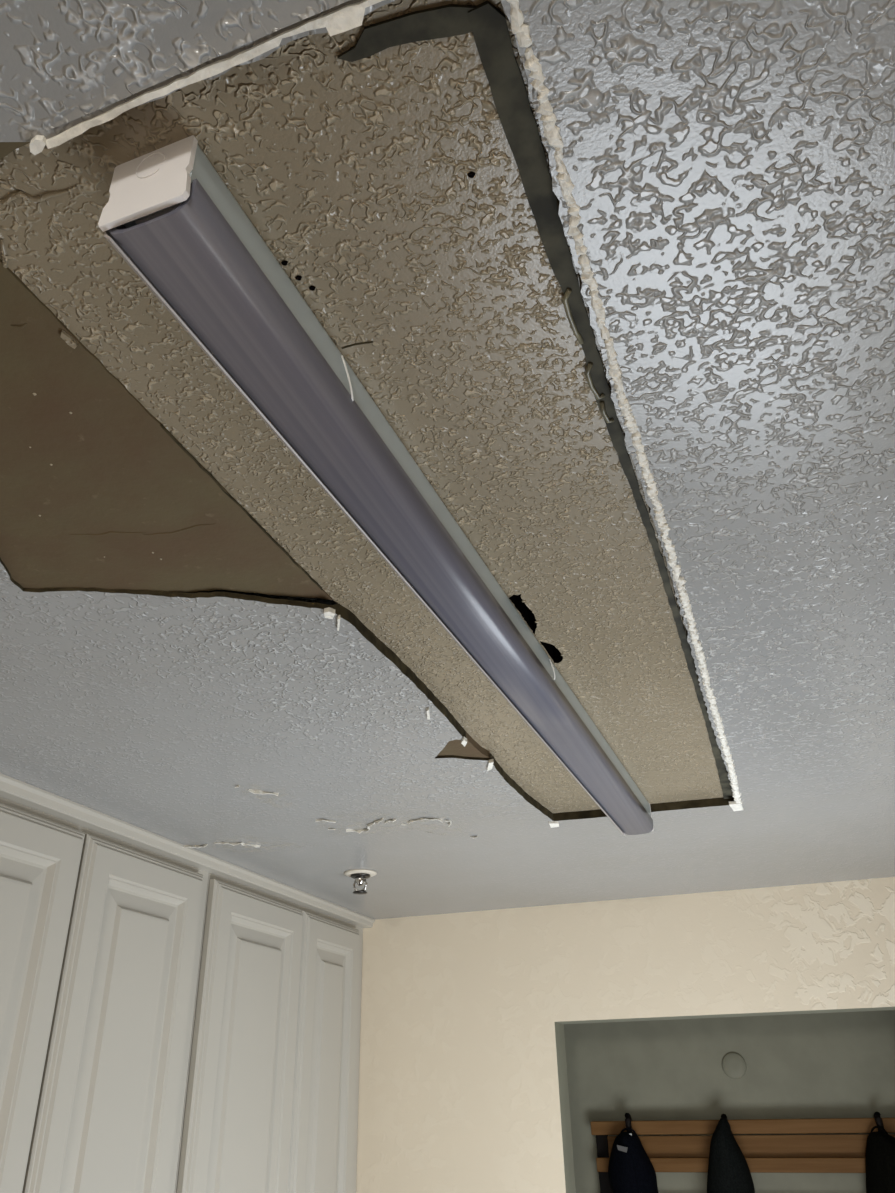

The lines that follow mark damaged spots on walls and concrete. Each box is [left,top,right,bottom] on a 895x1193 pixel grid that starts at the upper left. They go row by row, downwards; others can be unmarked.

peeling [29,135,47,155]